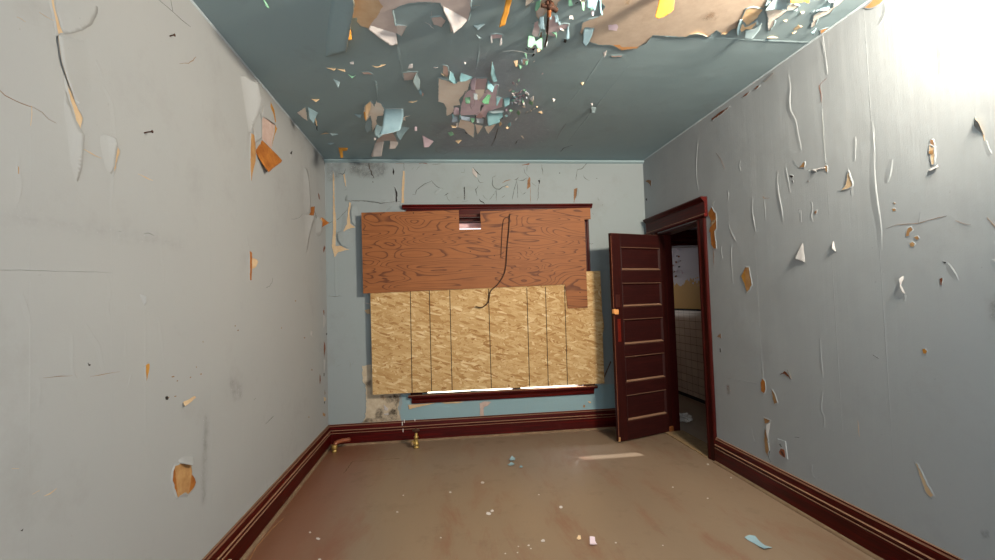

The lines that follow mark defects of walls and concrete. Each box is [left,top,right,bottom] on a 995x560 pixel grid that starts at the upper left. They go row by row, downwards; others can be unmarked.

peeling [67,85,83,128]
peeling [250,104,277,181]
peeling [296,99,348,158]
peeling [323,173,355,257]
crack [330,131,543,223]
peeling [325,0,844,157]
peeling [361,364,615,423]
peeling [175,464,192,497]